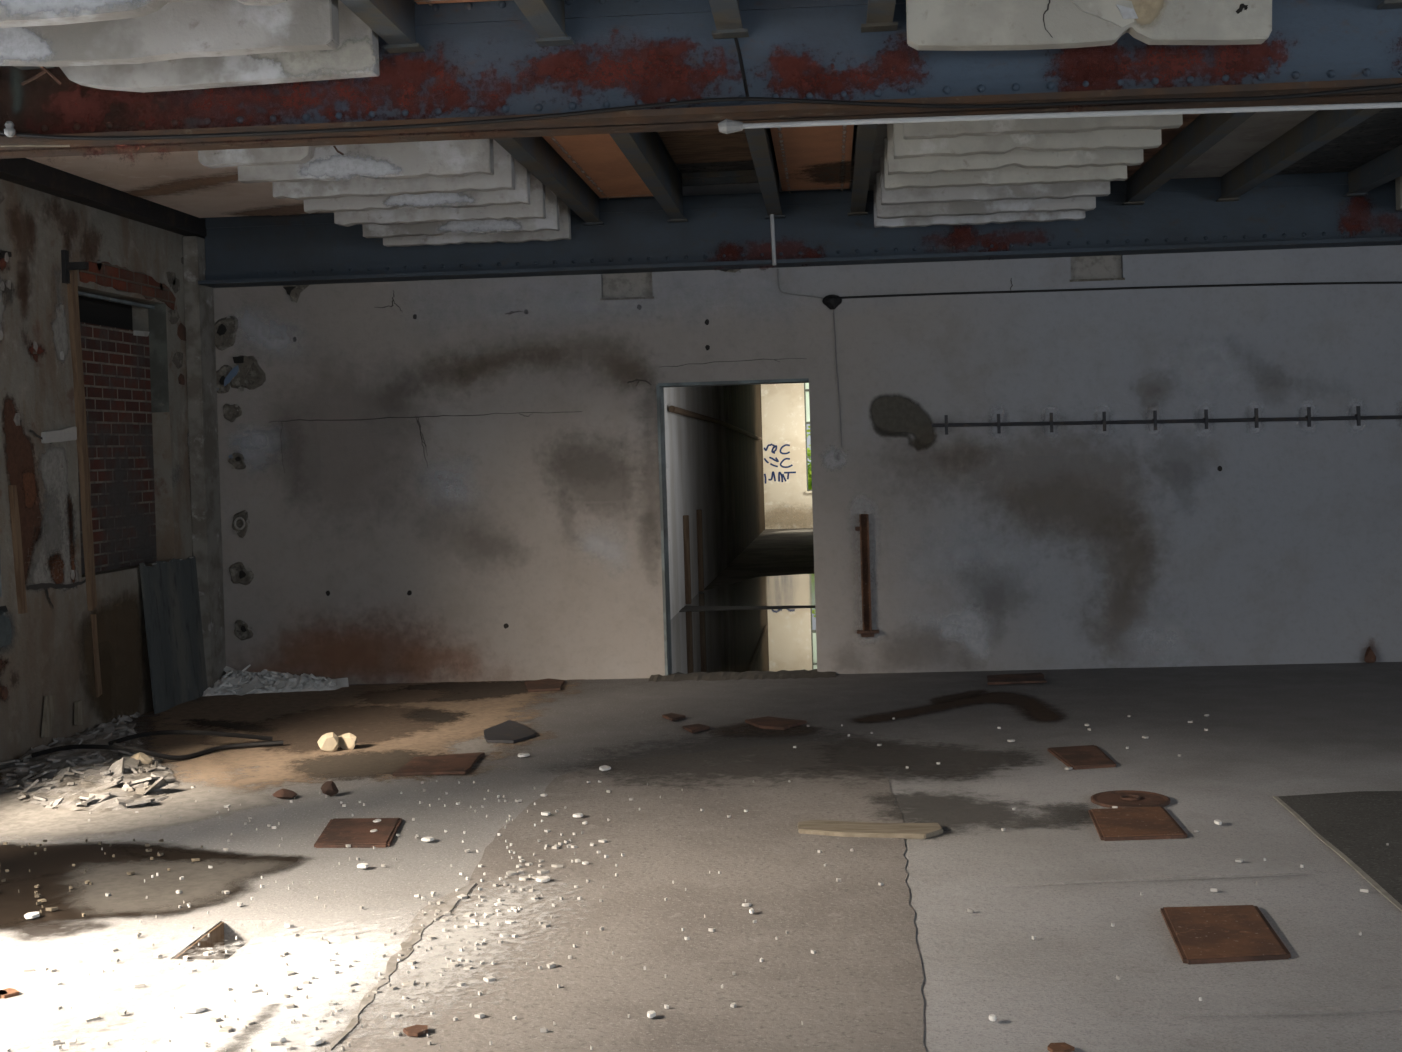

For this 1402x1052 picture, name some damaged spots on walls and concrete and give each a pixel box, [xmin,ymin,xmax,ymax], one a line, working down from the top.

flaking render [23,270,68,362]
flaking render [79,257,186,385]
spalling [214,316,266,422]
flaking render [2,396,79,591]
spalling [228,452,246,470]
spalling [232,510,250,538]
spalling [229,562,254,585]